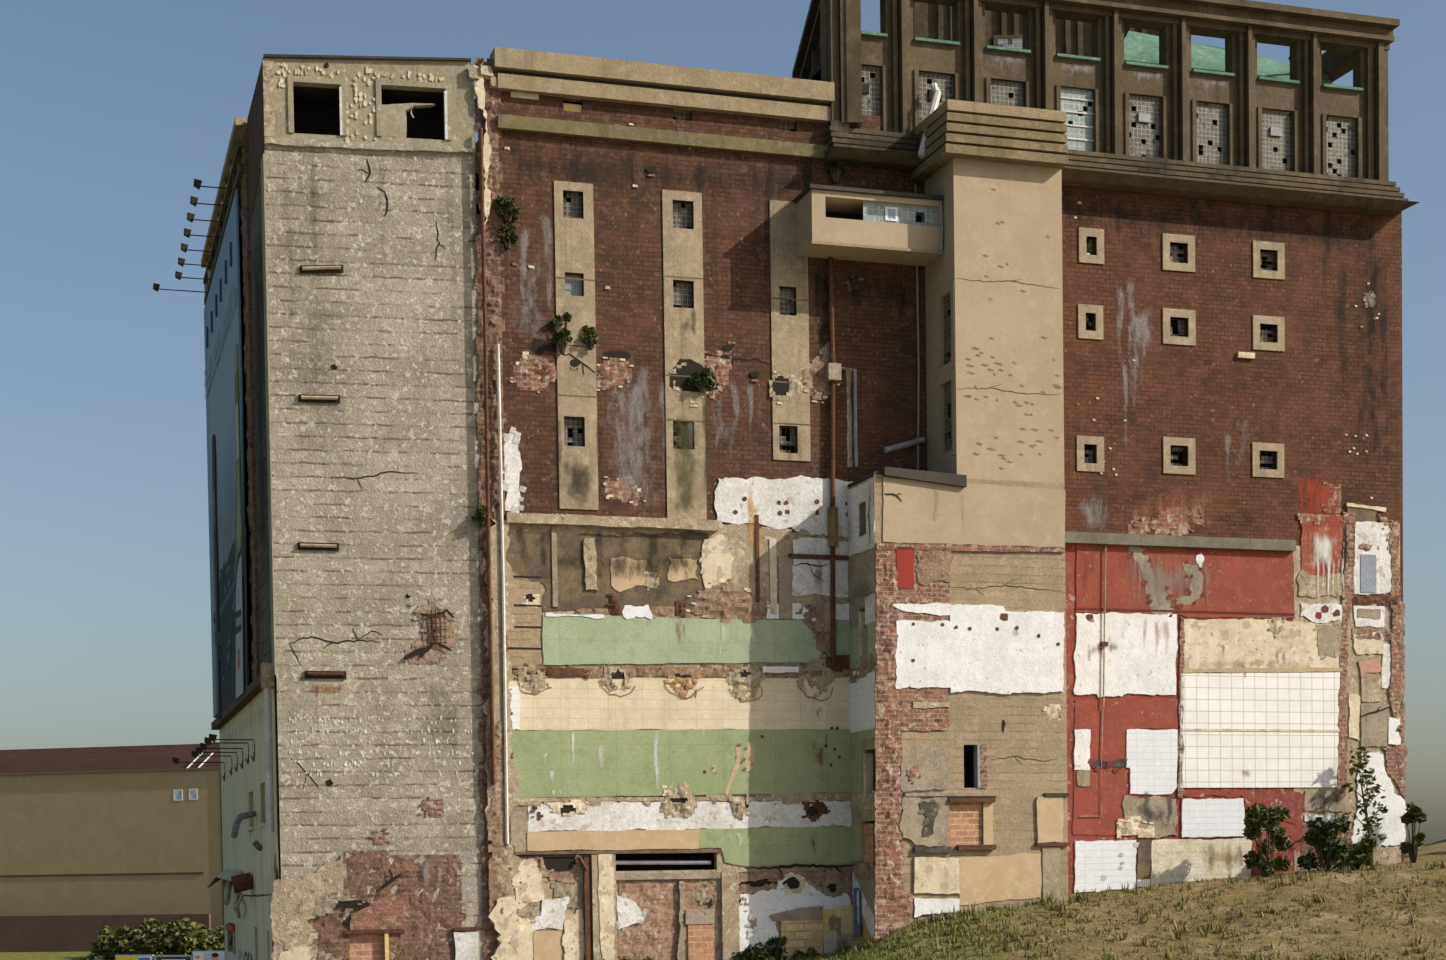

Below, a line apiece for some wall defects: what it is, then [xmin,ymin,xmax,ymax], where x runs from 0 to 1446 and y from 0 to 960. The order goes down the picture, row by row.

spalling [510,337,634,393]
peeling [1128,505,1205,617]
crack [289,609,454,664]
spalling [279,828,467,960]
spalling [616,878,721,960]
spalling [739,862,875,939]